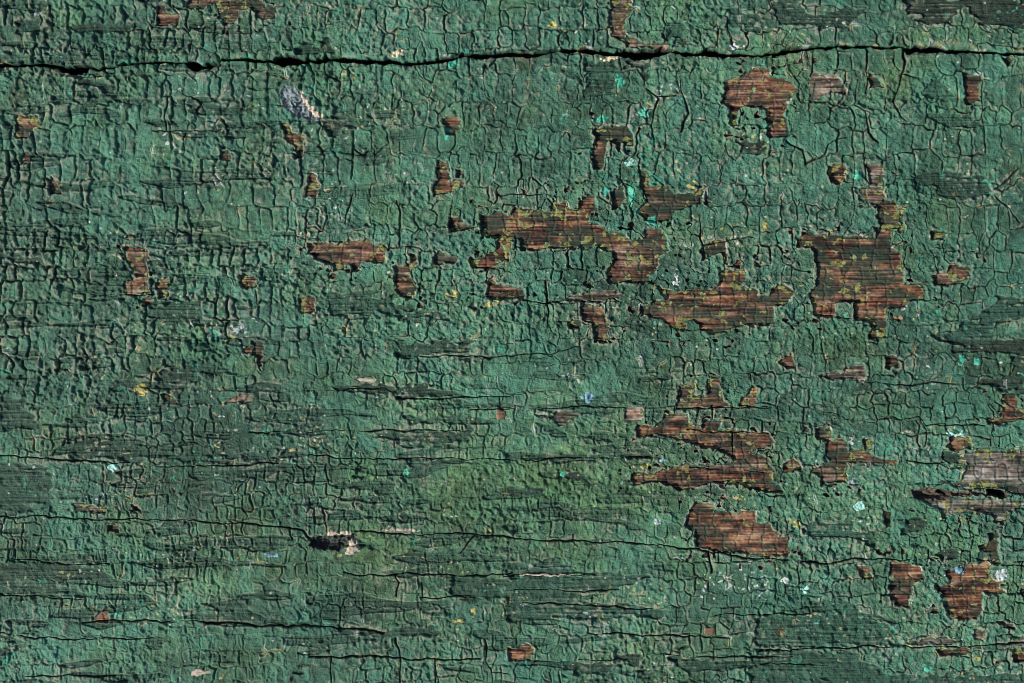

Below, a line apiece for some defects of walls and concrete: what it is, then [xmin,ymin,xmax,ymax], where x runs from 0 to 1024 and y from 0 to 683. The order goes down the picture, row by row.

crack [0,45,1024,166]
peeling [708,43,850,154]
peeling [117,235,169,309]
peeling [290,108,990,349]
crack [0,515,310,540]
crack [0,387,648,468]
crack [676,406,772,474]
peeling [618,373,902,594]
crack [820,410,986,464]
peeling [875,390,1024,663]
crack [0,593,508,683]
crack [343,530,1024,665]